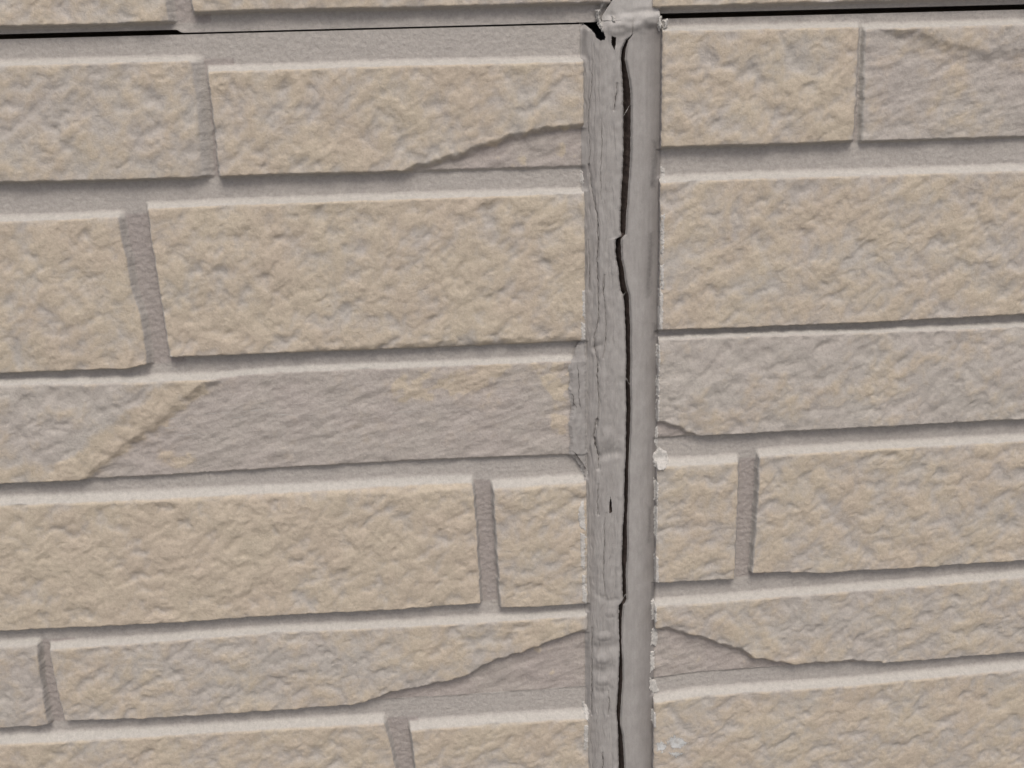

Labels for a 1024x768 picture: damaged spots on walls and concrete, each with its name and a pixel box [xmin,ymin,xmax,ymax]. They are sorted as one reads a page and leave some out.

crack [587,37,631,768]